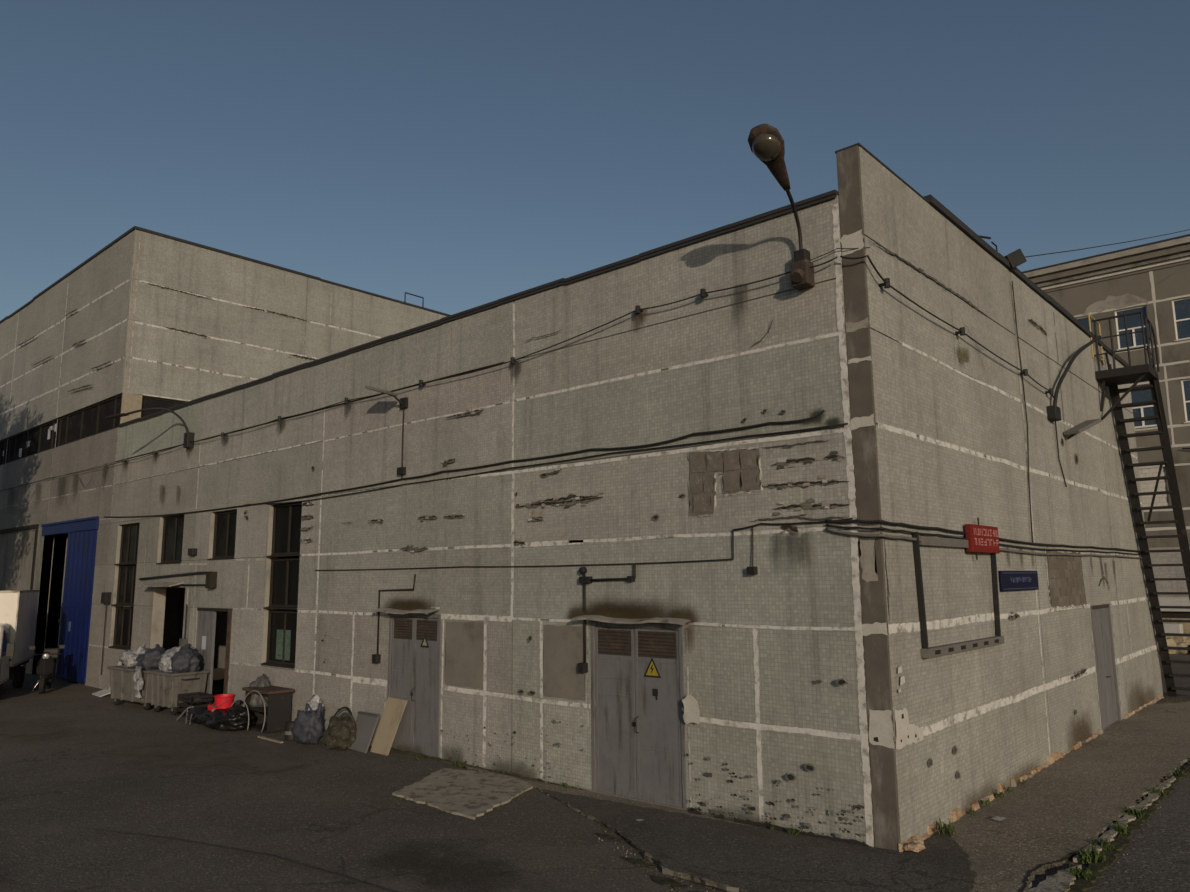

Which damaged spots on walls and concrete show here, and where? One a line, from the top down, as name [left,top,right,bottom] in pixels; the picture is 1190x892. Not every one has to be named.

spalling [515,492,604,522]
peeling [679,447,850,533]
peeling [857,522,880,582]
peeling [868,708,924,749]
peeling [688,757,866,843]